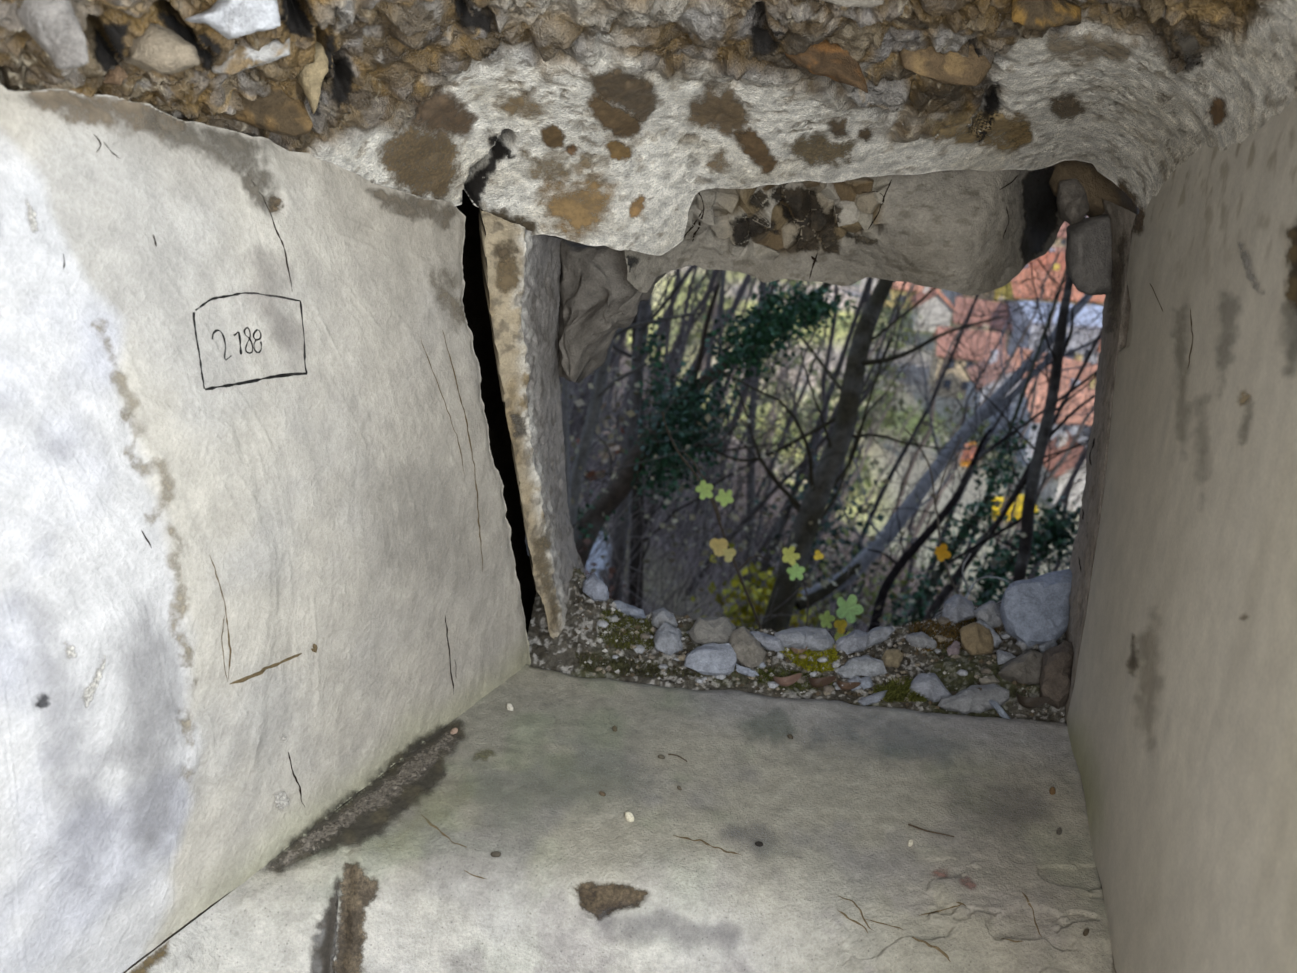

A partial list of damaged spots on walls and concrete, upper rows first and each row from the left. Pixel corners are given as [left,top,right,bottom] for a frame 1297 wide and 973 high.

water stain [583,68,657,122]
water stain [500,96,591,180]
water stain [688,81,778,175]
water stain [858,128,872,142]
water stain [371,189,455,229]
water stain [490,208,536,235]
crack [421,189,537,635]
spalling [333,862,378,973]
spalling [575,882,648,920]
crack [839,896,965,961]
crack [1001,892,1042,942]